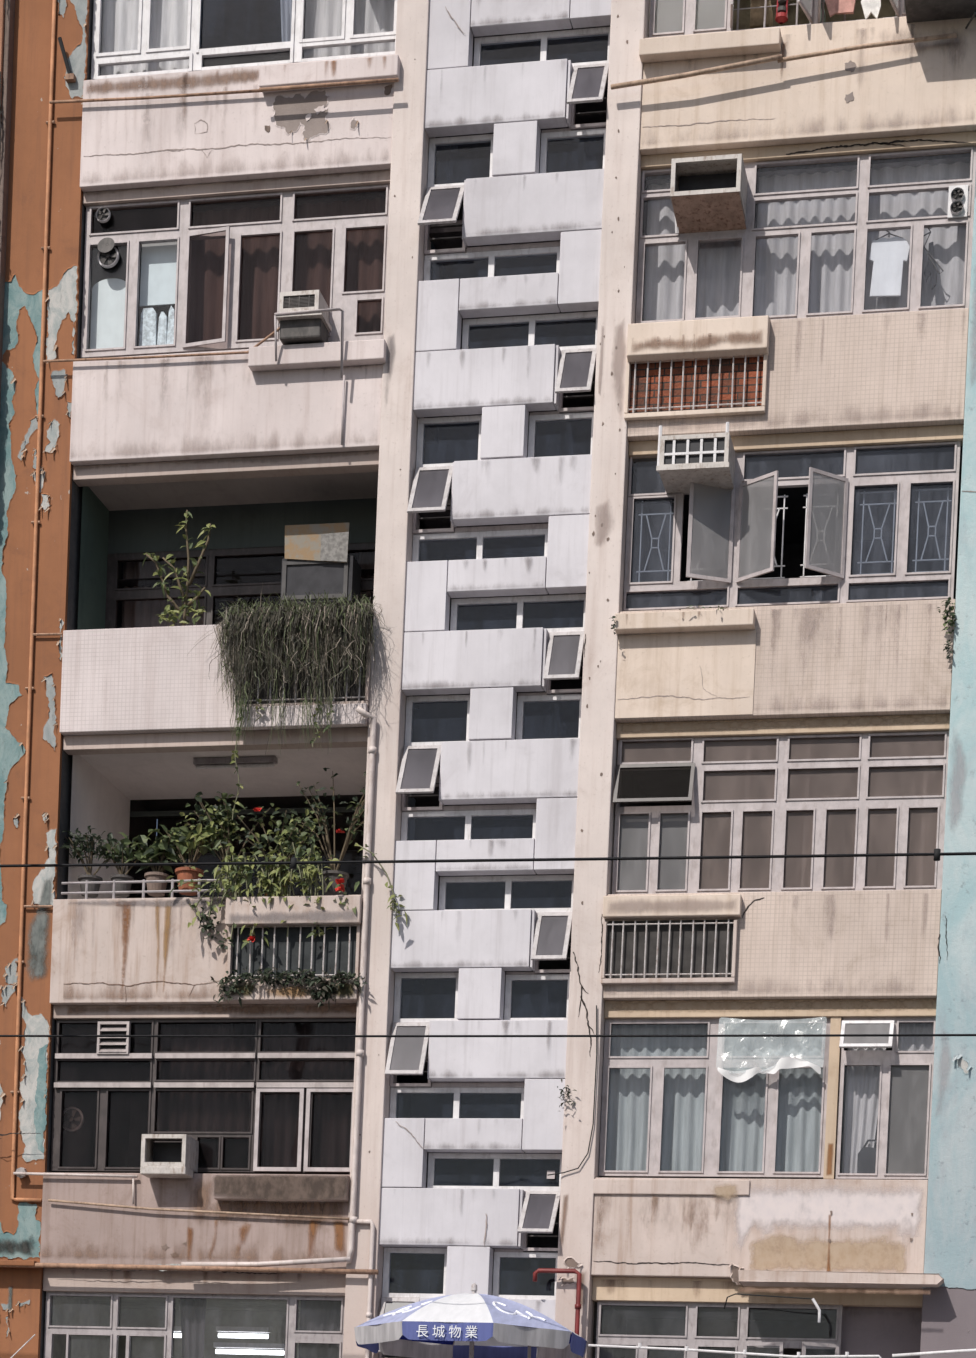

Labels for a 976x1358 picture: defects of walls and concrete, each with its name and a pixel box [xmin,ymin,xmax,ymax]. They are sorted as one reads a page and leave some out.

water stain [90,71,258,92]
peeling [265,89,331,142]
peeling [0,264,79,927]
crack [618,667,750,700]
rust [116,901,135,974]
rust [156,905,171,963]
peeling [0,953,51,1163]
peeling [0,1202,41,1260]
rust [335,1222,344,1251]
peeling [0,1299,31,1338]